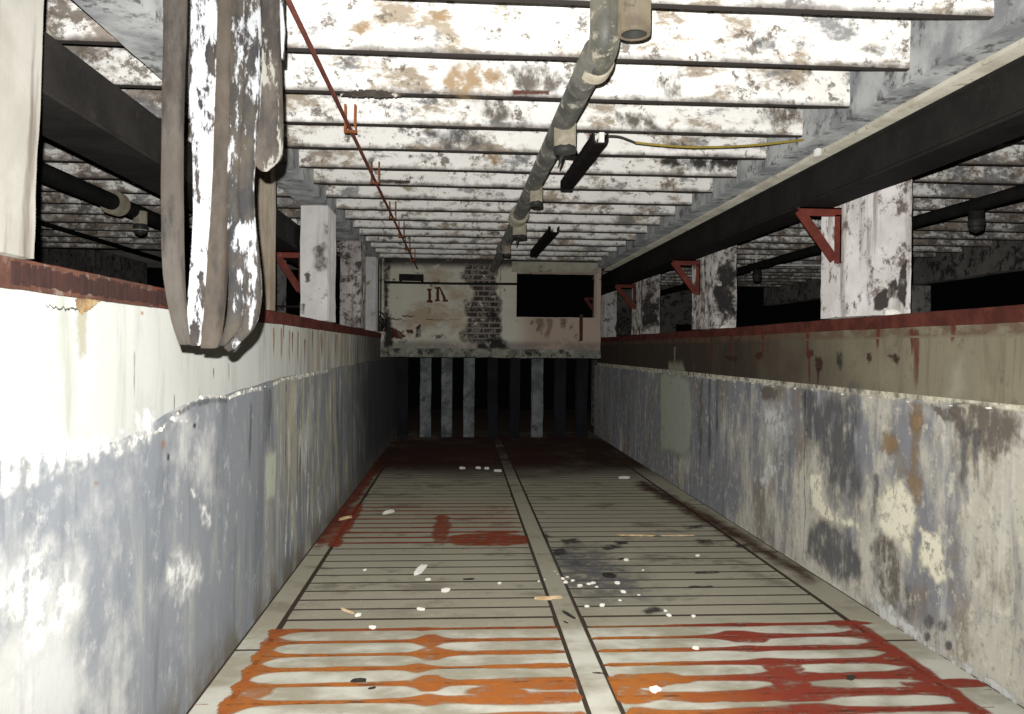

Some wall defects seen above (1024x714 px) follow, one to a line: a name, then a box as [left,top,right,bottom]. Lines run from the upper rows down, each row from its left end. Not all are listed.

leakage [444,66,560,93]
spalling [459,264,502,343]
corrosion [910,330,918,375]
corrosion [908,406,923,503]
leakage [934,360,1019,483]
leakage [808,521,860,579]